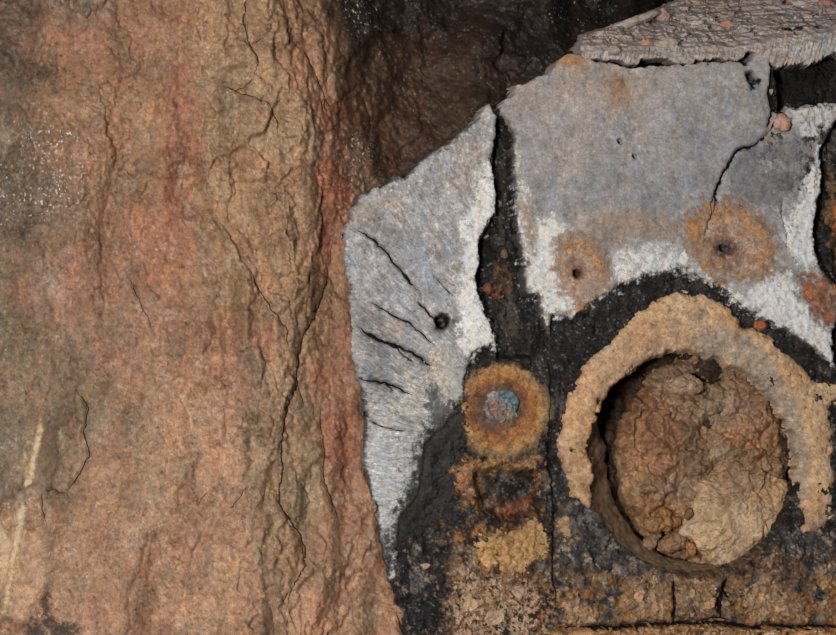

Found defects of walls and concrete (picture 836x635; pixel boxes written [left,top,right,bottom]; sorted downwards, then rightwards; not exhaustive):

crack [227,0,278,134]
crack [304,52,331,120]
crack [710,97,772,205]
crack [356,229,437,371]
water stain [399,157,500,429]
rust [549,231,613,314]
rust [684,195,777,287]
rust [796,271,836,328]
crack [251,236,340,618]
crack [360,378,412,395]
rust [450,363,554,495]
water stain [366,431,418,565]